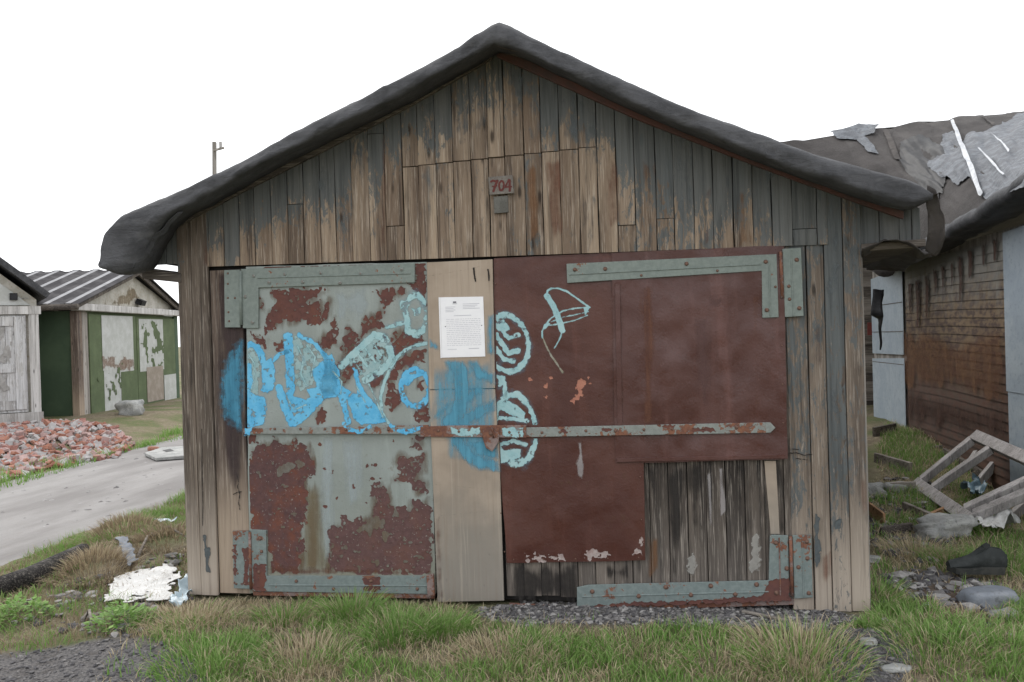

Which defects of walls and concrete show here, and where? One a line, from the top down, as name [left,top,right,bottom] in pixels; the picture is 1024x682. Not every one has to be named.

peeling [138,321,165,367]
corrosion [250,263,427,412]
peeling [98,363,129,401]
corrosion [232,403,434,593]
corrosion [525,552,566,563]
corrosion [584,548,611,561]
corrosion [595,578,791,607]